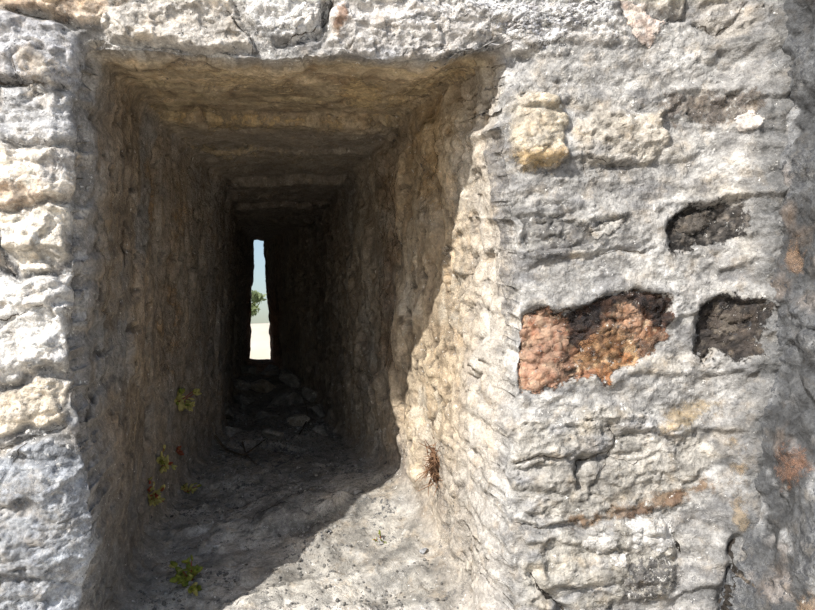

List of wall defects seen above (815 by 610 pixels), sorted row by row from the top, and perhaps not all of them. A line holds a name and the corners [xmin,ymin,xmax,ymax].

crack [276,0,334,46]
spalling [666,197,751,257]
spalling [518,288,675,394]
spalling [692,291,779,367]
crack [516,426,641,491]
crack [718,538,756,610]